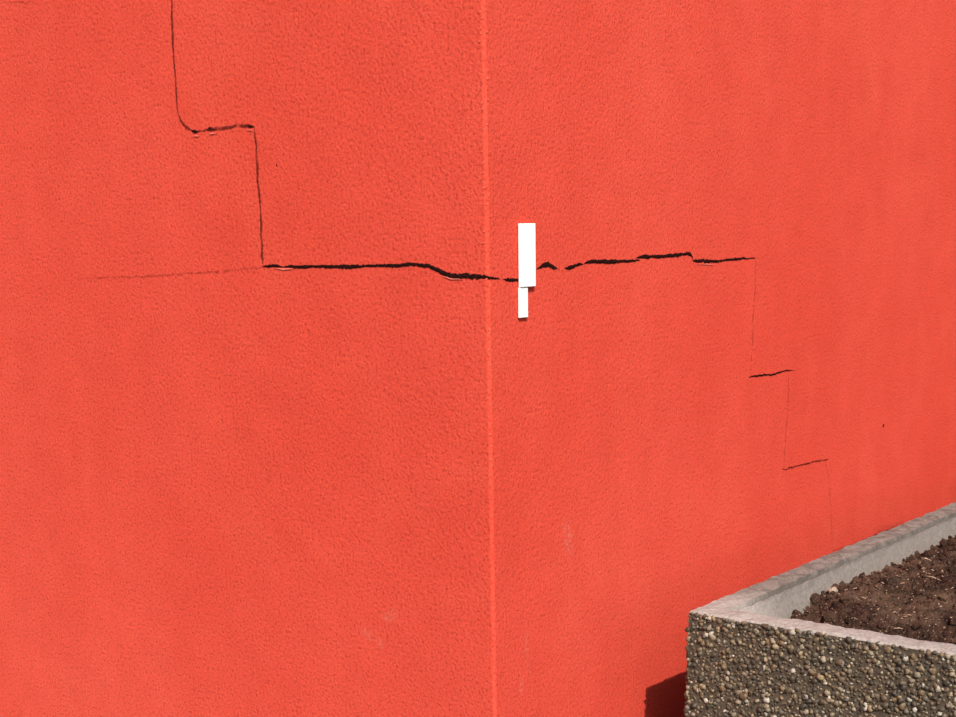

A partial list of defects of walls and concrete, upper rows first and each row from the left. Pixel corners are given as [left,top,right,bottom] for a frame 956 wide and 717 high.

crack [171,0,756,282]
crack [750,370,794,378]